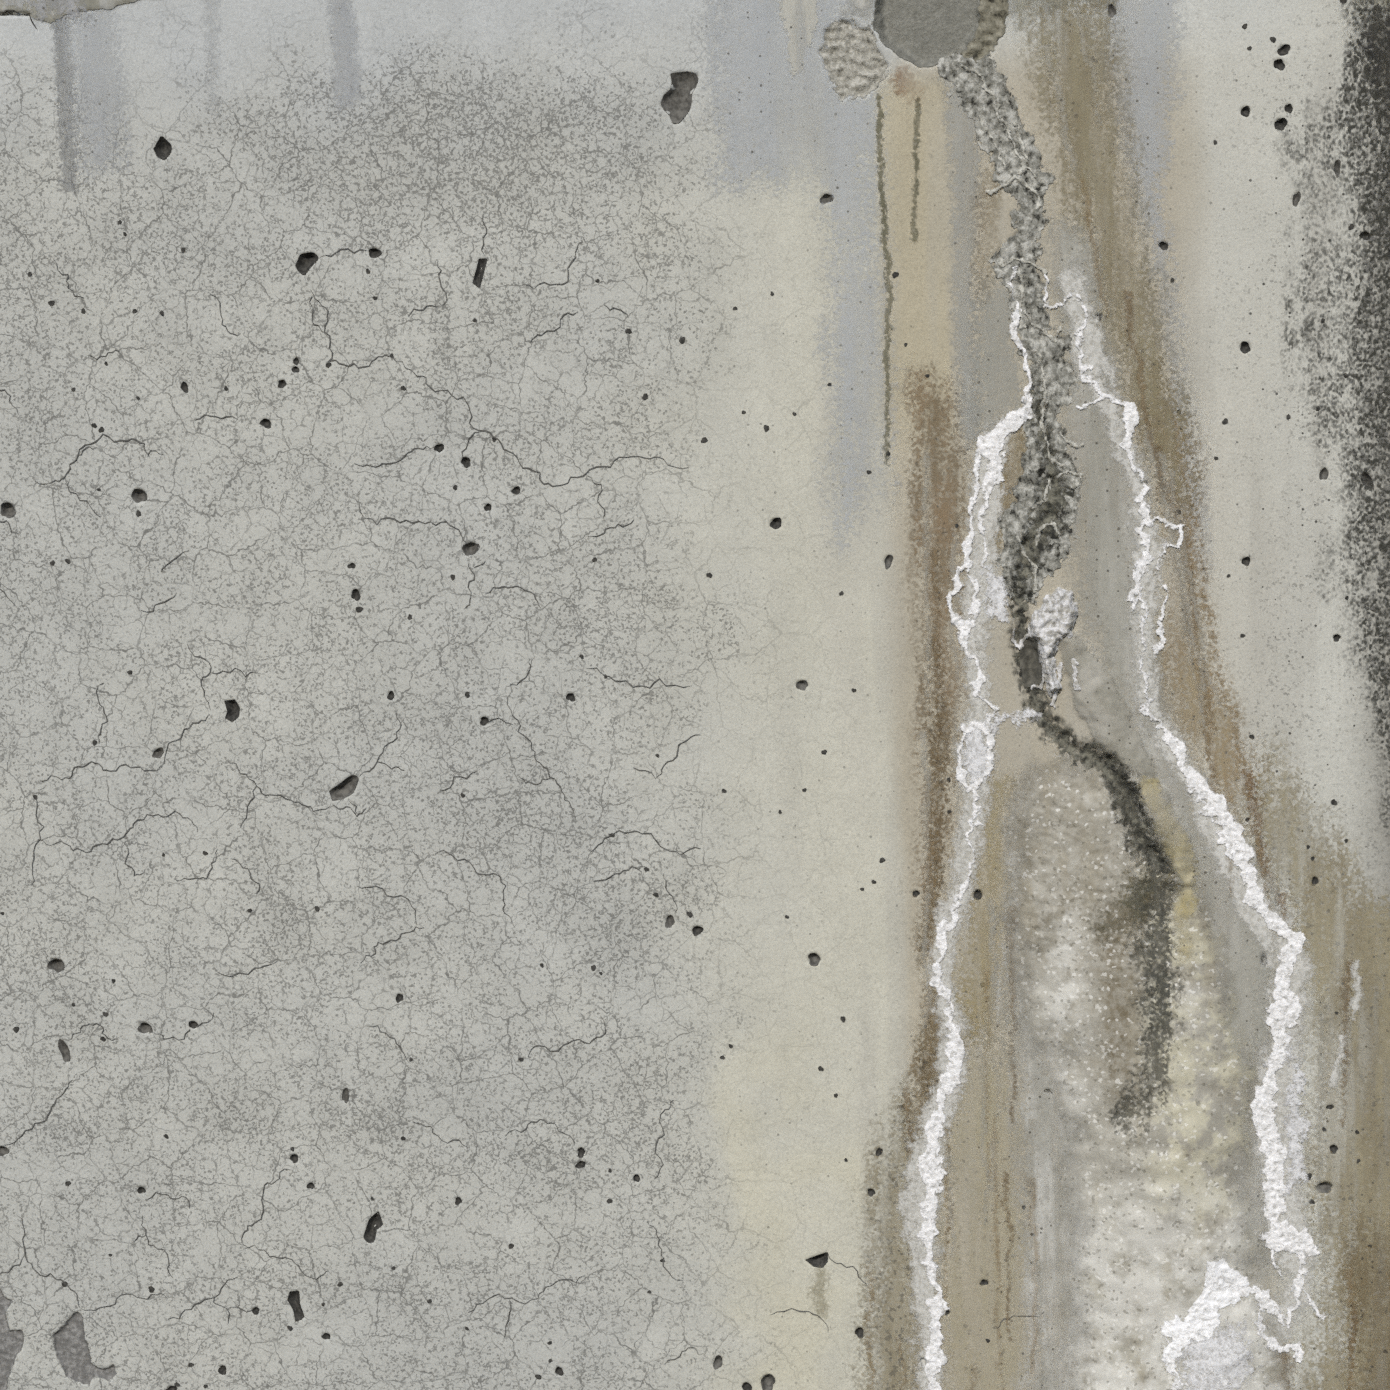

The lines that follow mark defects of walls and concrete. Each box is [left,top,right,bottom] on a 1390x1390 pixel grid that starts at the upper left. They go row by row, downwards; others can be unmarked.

flaking render [0,0,137,23]
spalling [819,18,888,101]
crack [309,241,689,537]
leakage [1282,0,1390,758]
crack [359,507,541,609]
crack [31,644,366,894]
leakage [897,79,1326,1390]
leakage [1349,960,1363,1021]
leakage [1330,1034,1346,1088]
crack [0,1169,326,1321]
peeling [0,1290,24,1390]
peeling [52,1312,117,1385]